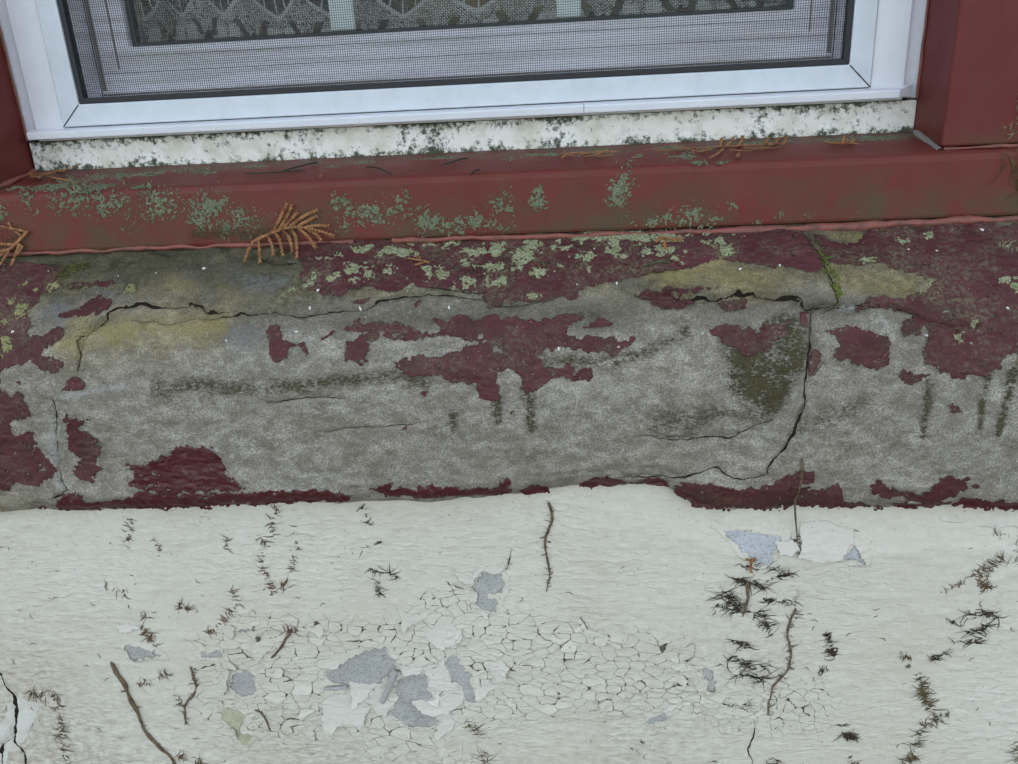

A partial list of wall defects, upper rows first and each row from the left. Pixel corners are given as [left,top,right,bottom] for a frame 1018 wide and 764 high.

peeling [0,261,116,491]
peeling [266,324,308,363]
crack [267,396,345,404]
peeling [275,221,1018,401]
crack [625,245,929,480]
peeling [38,444,350,511]
peeling [369,478,550,499]
peeling [579,469,1018,570]
peeling [114,622,169,663]
peeling [184,553,841,764]
crack [0,673,27,764]